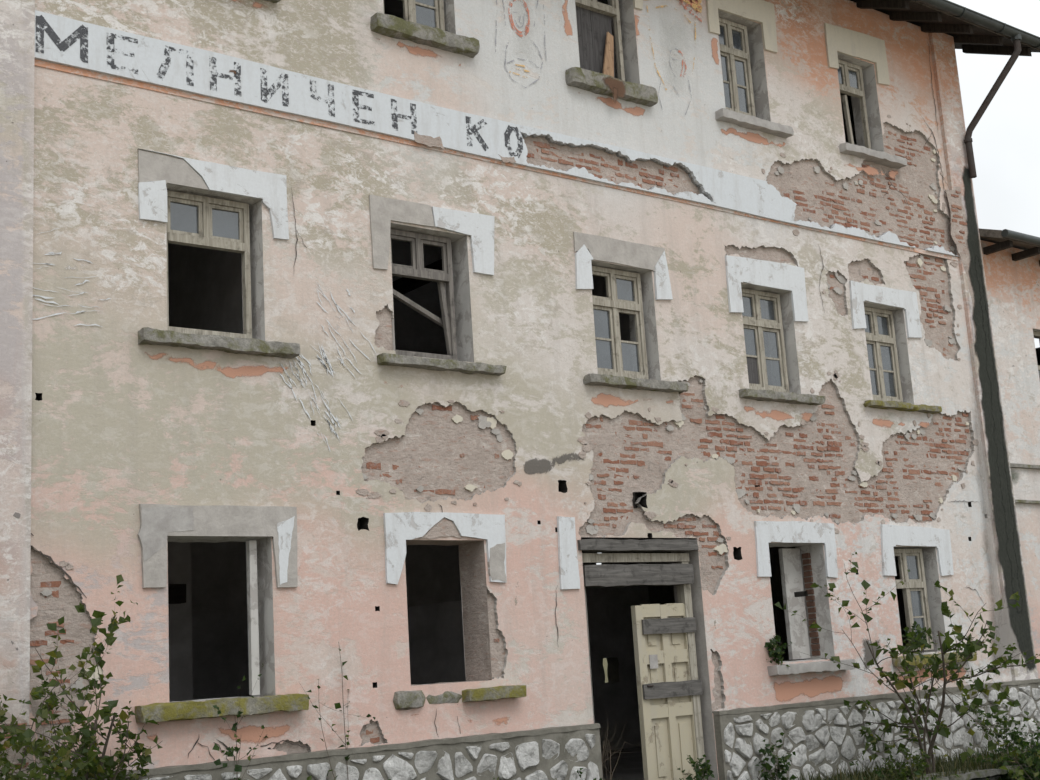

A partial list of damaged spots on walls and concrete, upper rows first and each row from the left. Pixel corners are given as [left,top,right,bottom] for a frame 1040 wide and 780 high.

spalling [523,135,710,199]
spalling [721,115,976,361]
peeling [150,283,394,452]
spalling [356,400,522,511]
spalling [577,370,979,595]
spalling [0,546,103,775]
spalling [483,543,508,679]